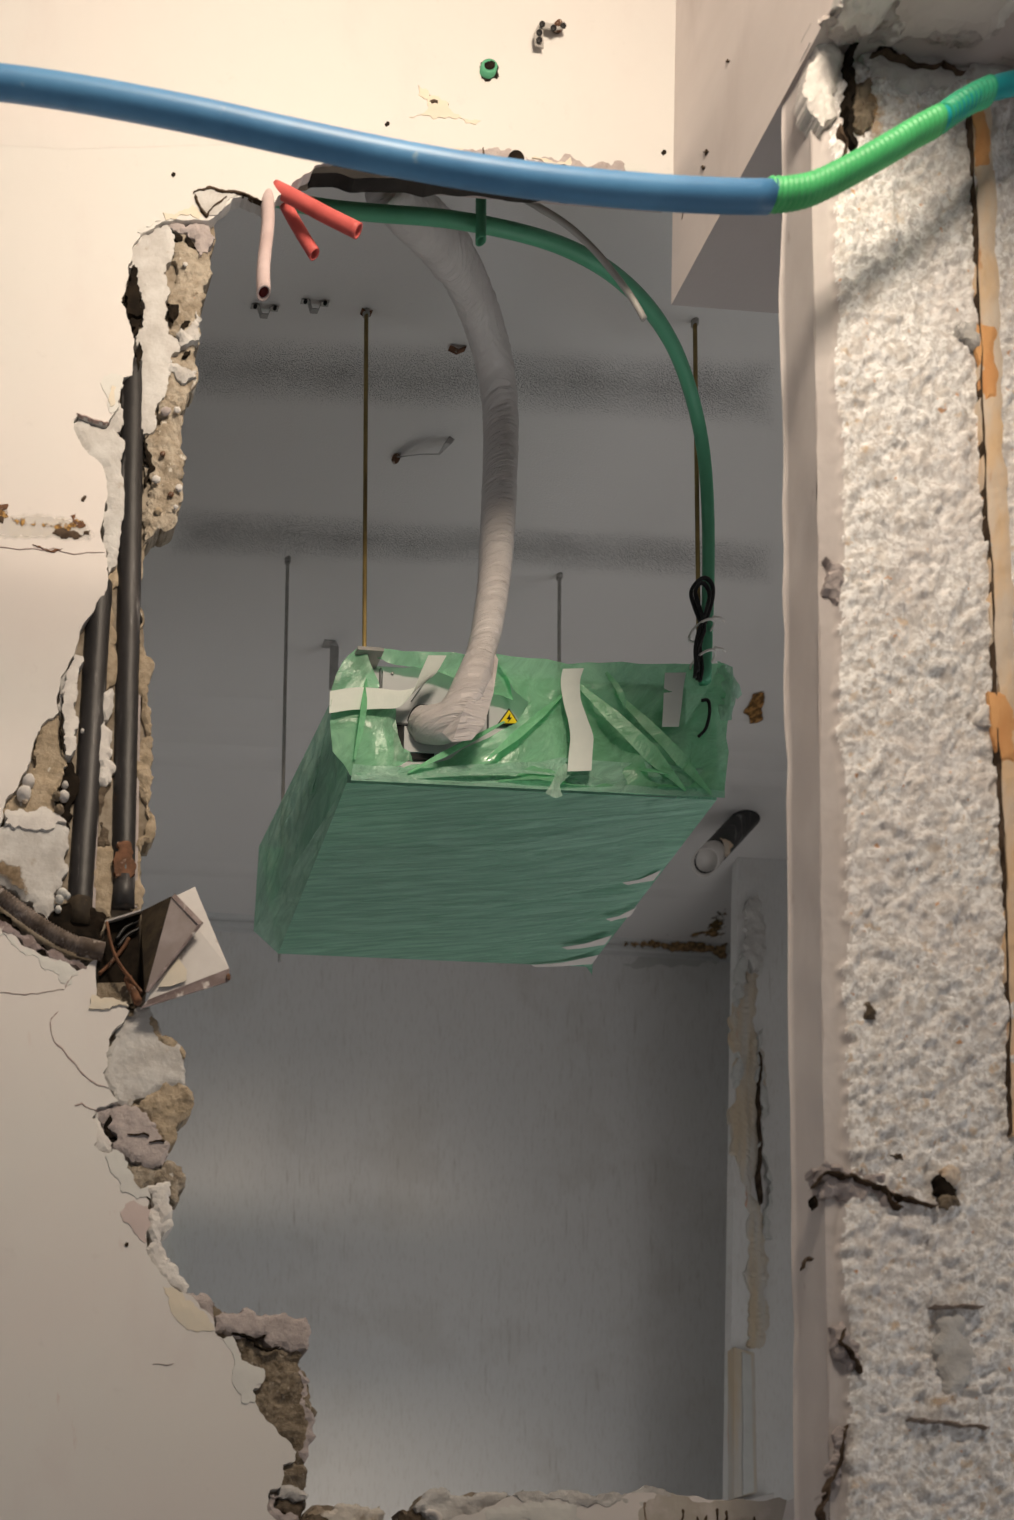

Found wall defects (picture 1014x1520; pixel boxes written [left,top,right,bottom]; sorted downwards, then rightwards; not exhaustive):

crack [836,42,966,156]
spalling [795,0,1014,138]
spalling [74,223,215,575]
corrosion [0,495,90,553]
spalling [55,761,80,831]
spalling [47,902,107,941]
corrosion [624,912,728,959]
crack [808,1170,940,1211]
spalling [89,994,787,1520]
crack [800,1256,814,1271]
crack [838,1327,863,1375]
crack [814,1423,850,1520]